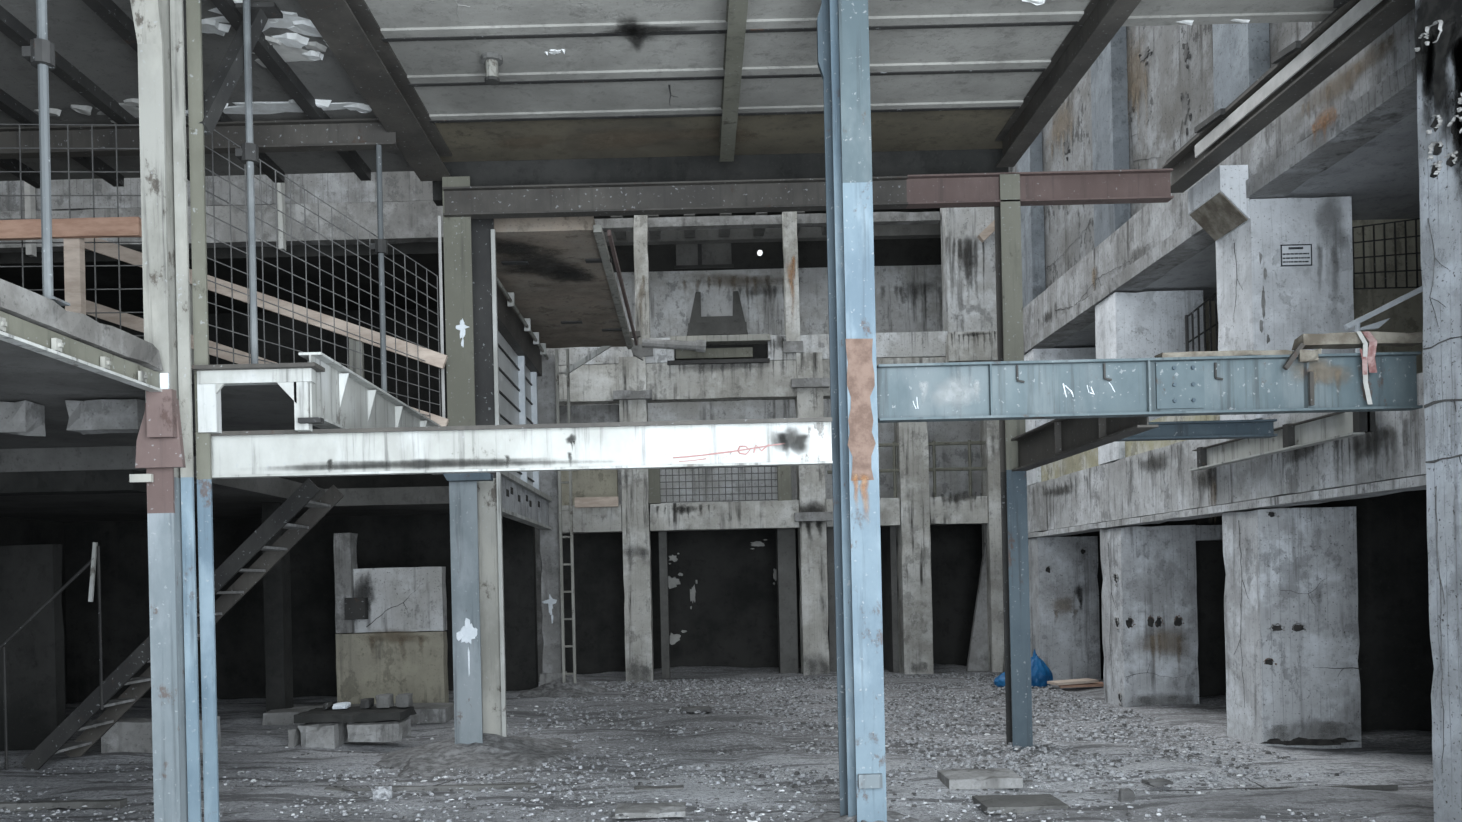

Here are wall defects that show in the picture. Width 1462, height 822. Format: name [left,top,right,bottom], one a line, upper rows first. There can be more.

flaking render [202,0,243,36]
flaking render [252,11,329,68]
spalling [1414,20,1443,52]
hole [1426,93,1462,178]
damp [946,238,984,278]
rust [845,339,876,501]